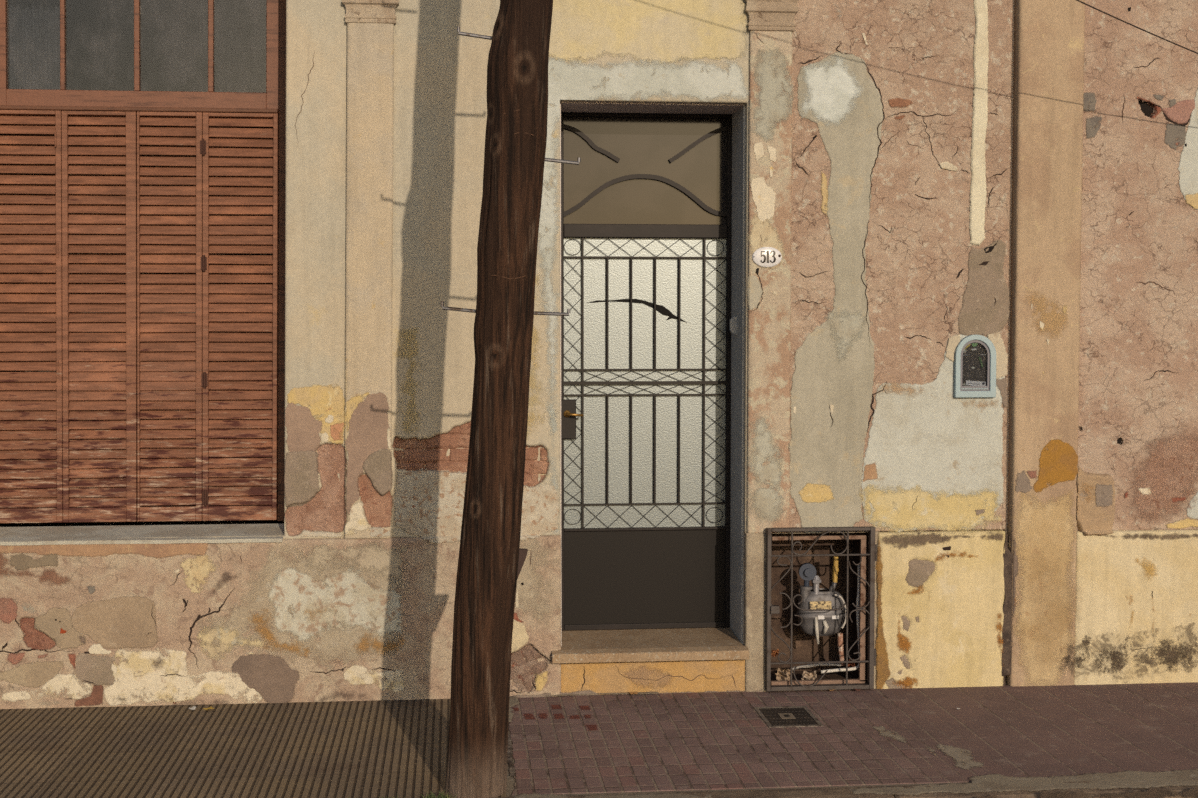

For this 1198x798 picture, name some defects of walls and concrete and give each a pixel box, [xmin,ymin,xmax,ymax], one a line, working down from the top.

peeling [538,0,793,432]
crack [172,556,242,669]
peeling [0,370,471,707]
peeling [510,445,560,693]
peeling [885,655,910,689]
peeling [902,616,919,631]
peeling [906,559,935,587]
peeling [861,484,1001,534]
peeling [1016,439,1078,686]
water stain [1066,636,1128,672]
spalling [1125,433,1198,519]
water stain [1153,640,1197,669]